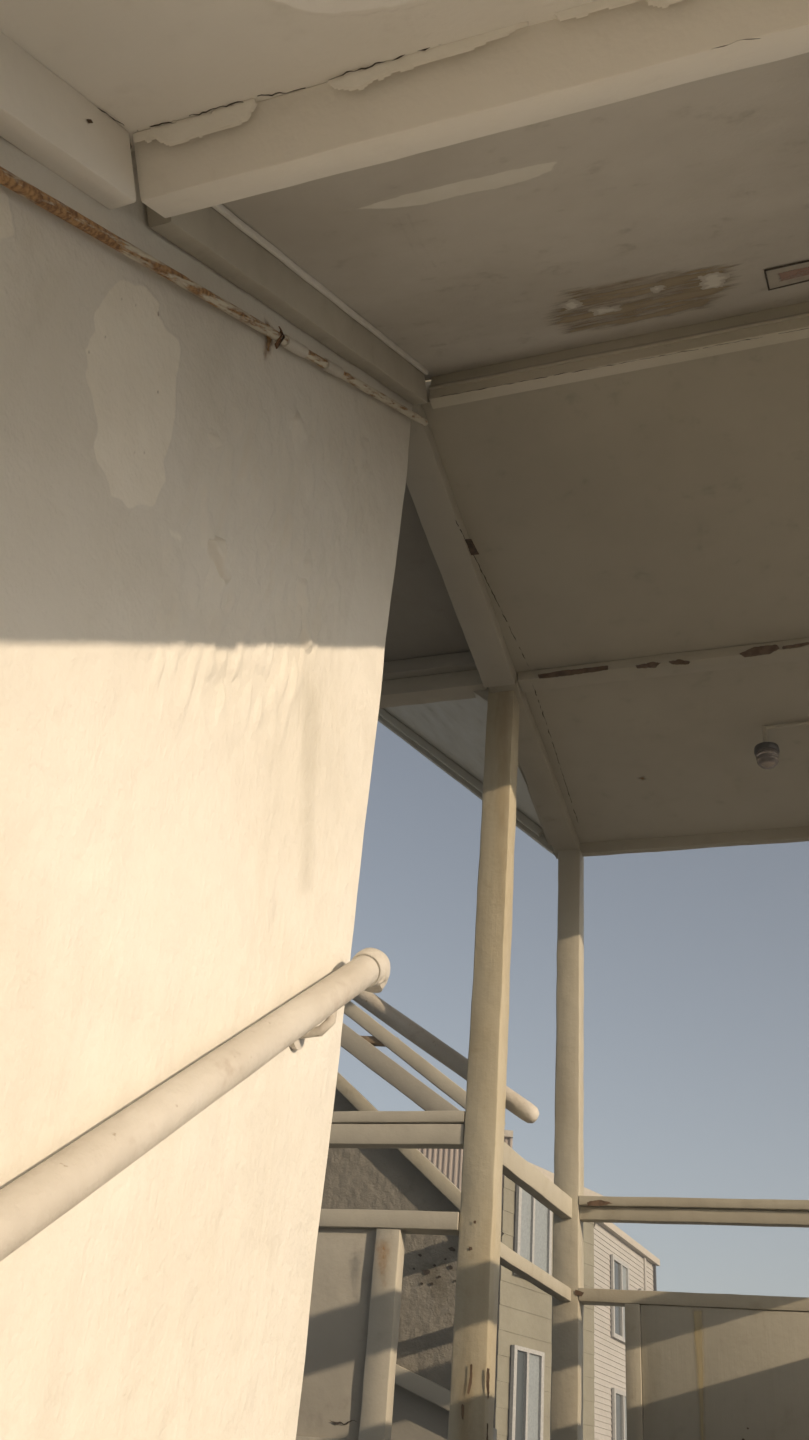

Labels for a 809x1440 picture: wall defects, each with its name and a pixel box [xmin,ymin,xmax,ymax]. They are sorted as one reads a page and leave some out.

peeling [268,0,435,18]
peeling [554,0,684,21]
peeling [328,22,529,91]
peeling [132,98,257,147]
peeling [740,642,809,657]
peeling [538,666,608,679]
peeling [635,659,690,668]